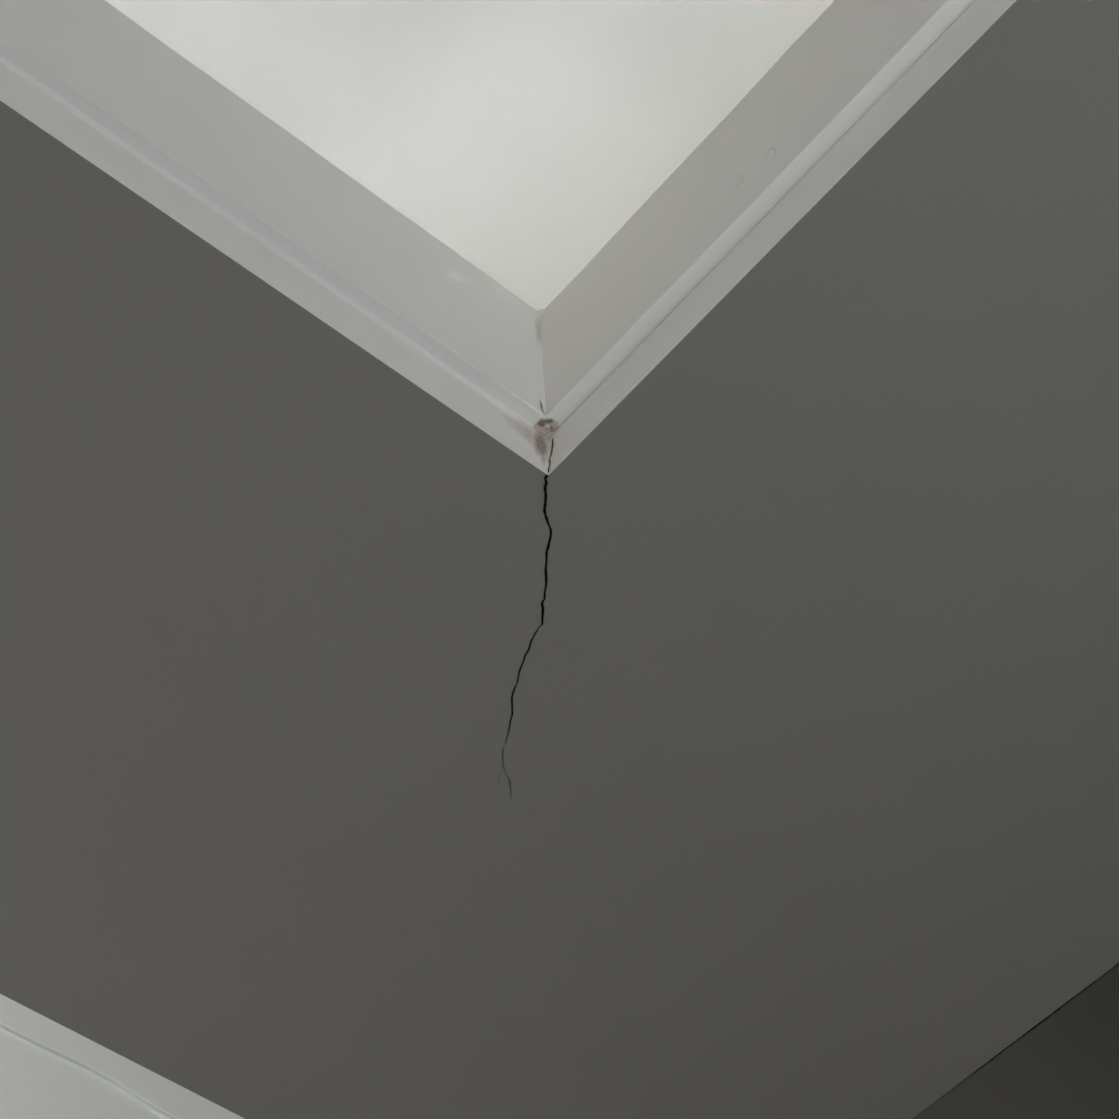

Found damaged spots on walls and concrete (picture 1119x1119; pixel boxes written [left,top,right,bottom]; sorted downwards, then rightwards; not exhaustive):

crack [502,439,553,757]